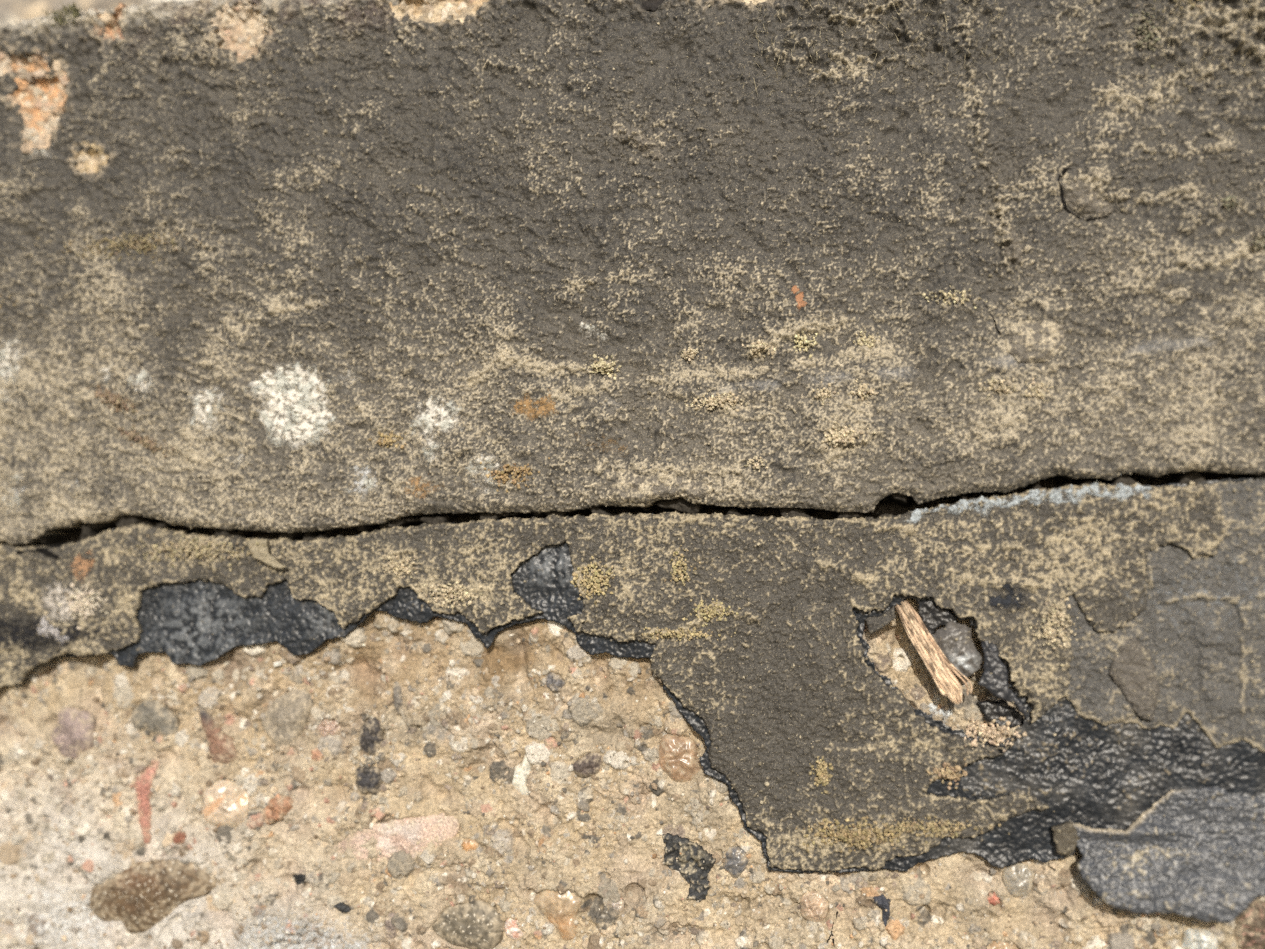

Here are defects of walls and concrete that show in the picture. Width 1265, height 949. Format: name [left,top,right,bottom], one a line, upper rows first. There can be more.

spalling [388,0,489,26]
spalling [641,0,664,12]
spalling [0,50,69,154]
crack [0,471,1265,560]
peeling [0,477,1265,923]